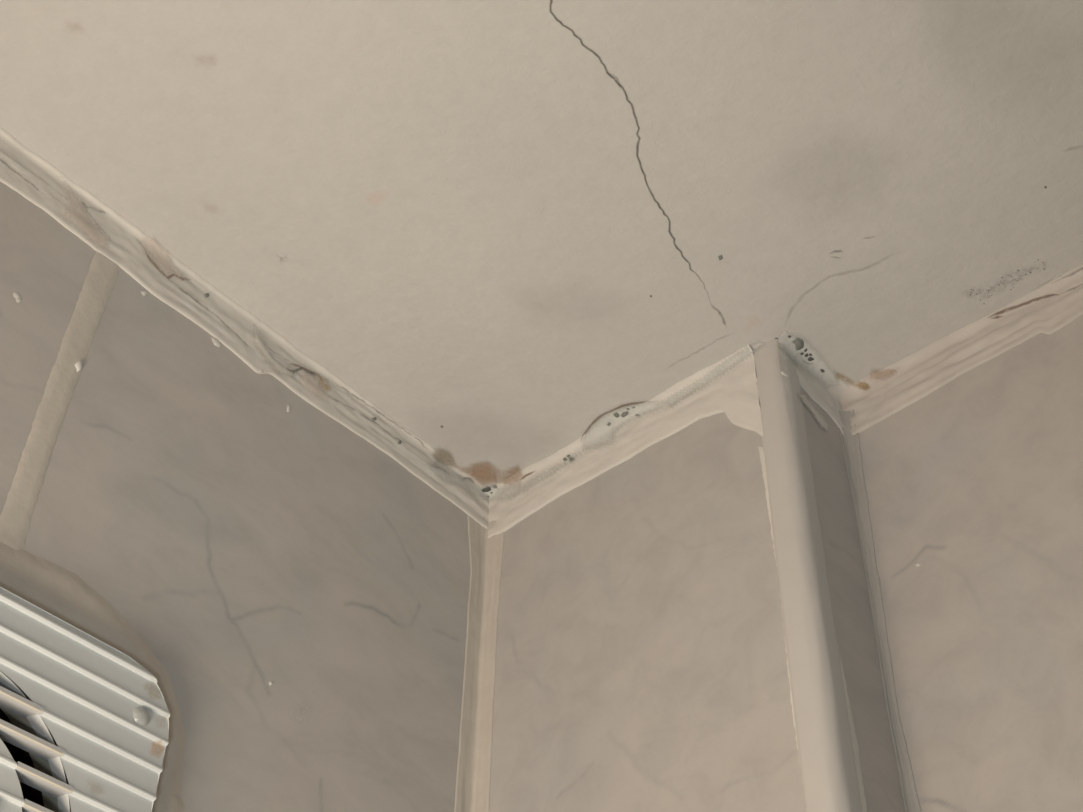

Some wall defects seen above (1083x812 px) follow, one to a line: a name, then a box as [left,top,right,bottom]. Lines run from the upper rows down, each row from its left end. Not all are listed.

crack [550,0,692,271]
spalling [582,343,762,449]
spalling [780,335,838,386]